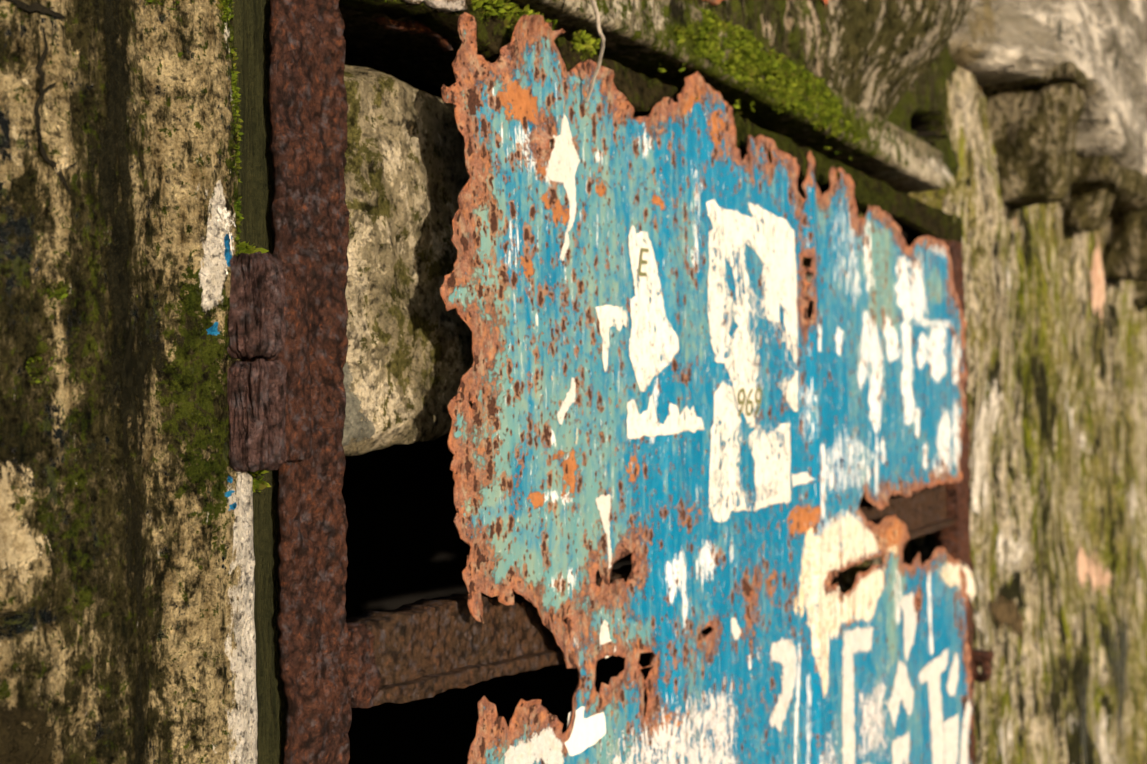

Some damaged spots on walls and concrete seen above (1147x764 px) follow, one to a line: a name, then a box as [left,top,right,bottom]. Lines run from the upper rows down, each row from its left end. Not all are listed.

damp [666,0,687,26]
damp [84,0,185,764]
peeling [802,511,885,700]
damp [1102,605,1130,753]